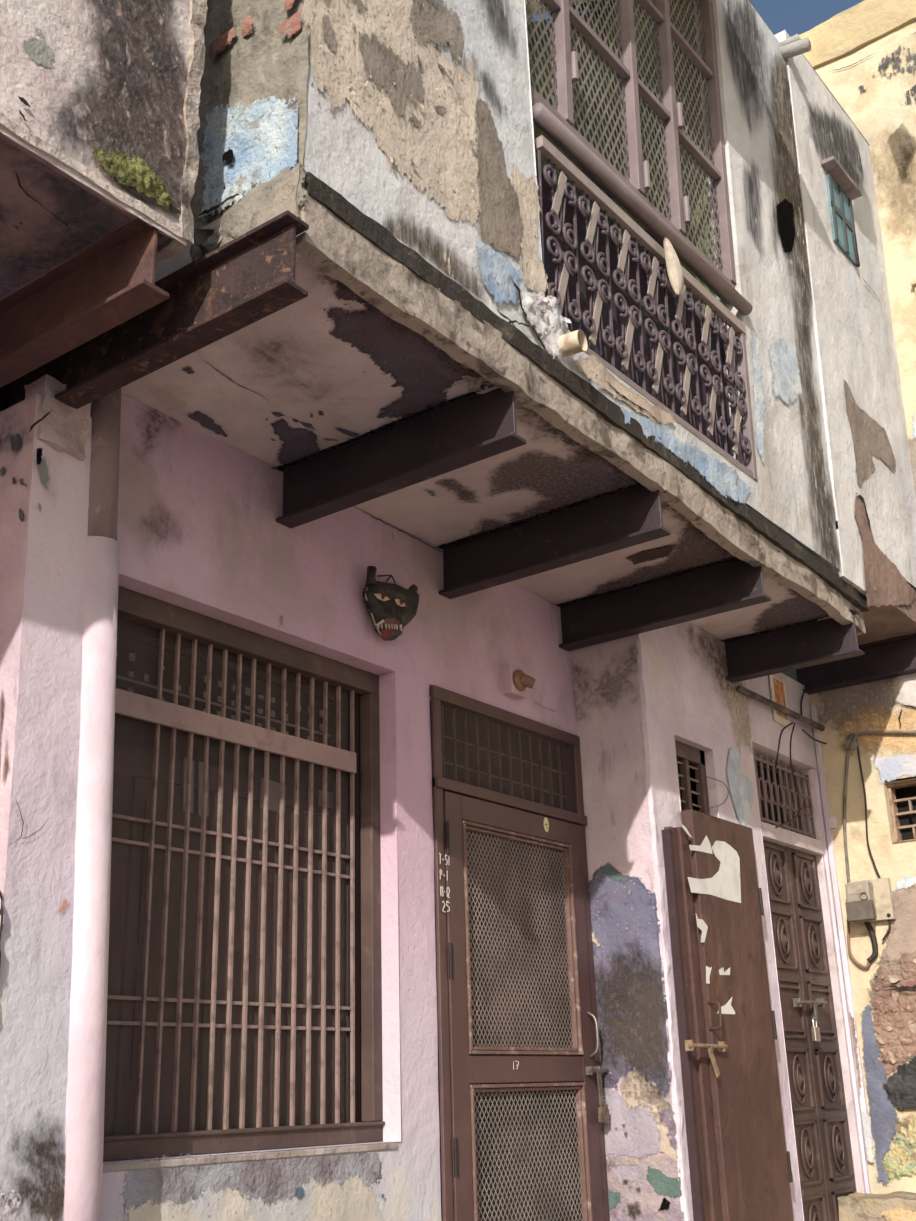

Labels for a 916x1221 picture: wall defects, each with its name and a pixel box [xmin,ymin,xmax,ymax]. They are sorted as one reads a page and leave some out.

crack [14,171,71,230]
peeling [198,96,306,238]
peeling [265,0,752,504]
peeling [750,330,802,463]
peeling [428,430,638,535]
peeling [844,380,916,609]
peeling [840,673,916,784]
peeling [589,861,684,1221]
spalling [843,875,916,1187]
crack [885,983,916,991]
water stain [17,1126,66,1221]
peeling [117,1175,385,1221]